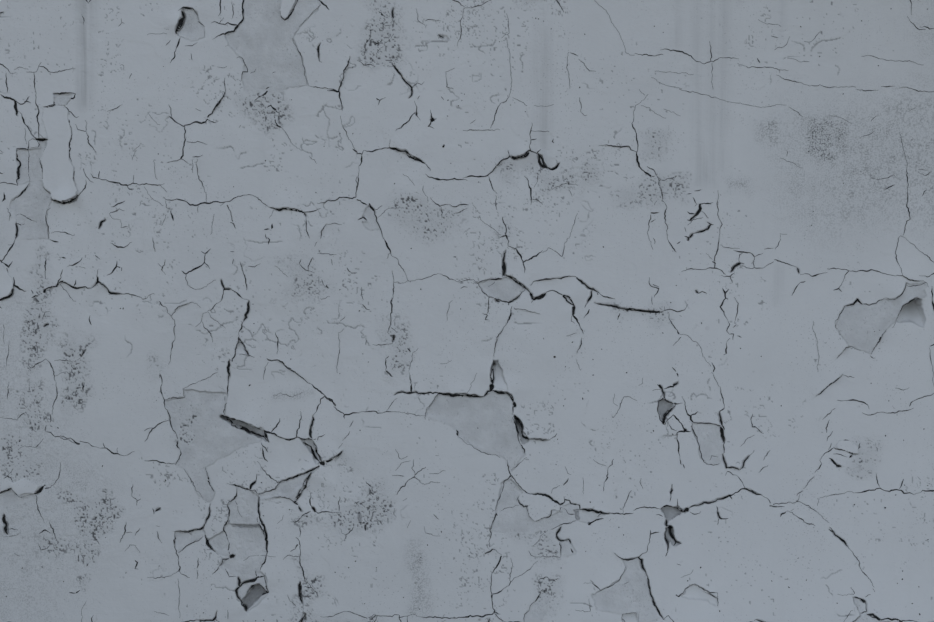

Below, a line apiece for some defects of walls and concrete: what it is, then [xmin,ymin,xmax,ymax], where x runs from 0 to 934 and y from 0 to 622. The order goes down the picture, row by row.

crack [0,64,69,201]
peeling [0,92,96,308]
flaking render [225,0,320,95]
crack [19,0,796,555]
crack [595,1,934,115]
crack [600,91,934,355]
peeling [835,282,928,359]
flaking render [148,389,342,612]
flaking render [362,385,580,558]
crack [485,457,561,622]
flaking render [577,530,674,622]
crack [838,588,917,622]